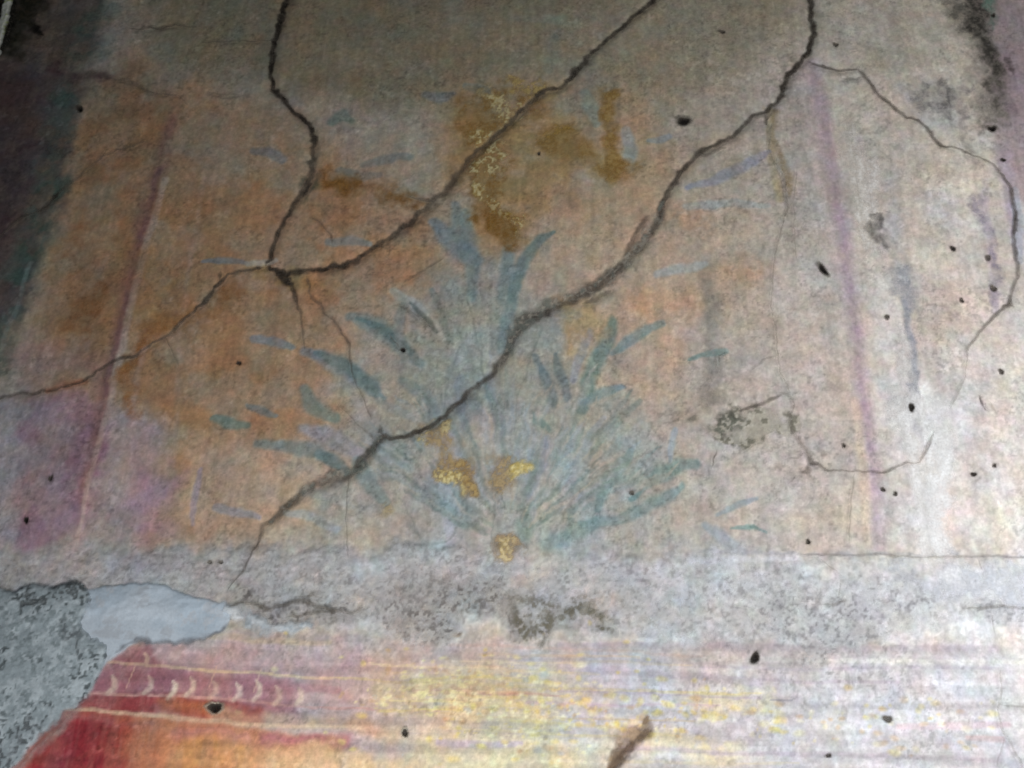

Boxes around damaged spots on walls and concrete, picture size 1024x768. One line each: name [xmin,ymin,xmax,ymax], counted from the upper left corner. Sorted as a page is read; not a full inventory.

crack [0,0,656,399]
crack [243,0,1020,572]
spalling [714,406,799,447]
hole [205,702,222,714]